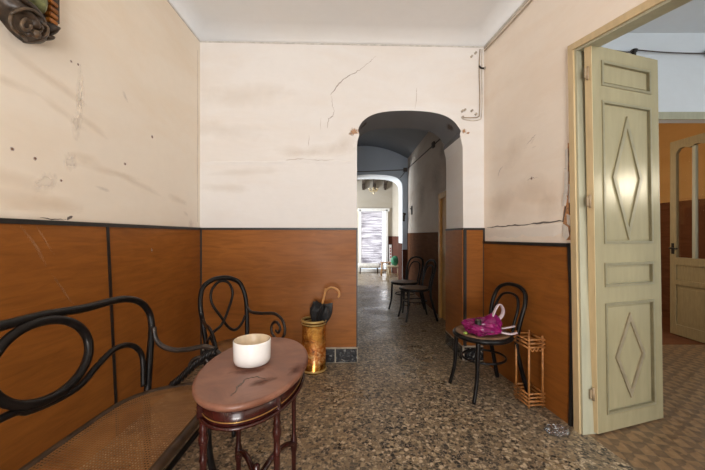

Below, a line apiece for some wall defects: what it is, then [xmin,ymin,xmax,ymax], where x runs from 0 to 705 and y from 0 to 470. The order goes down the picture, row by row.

crack [286,59,372,161]
crack [487,220,561,228]
peeling [562,143,571,240]